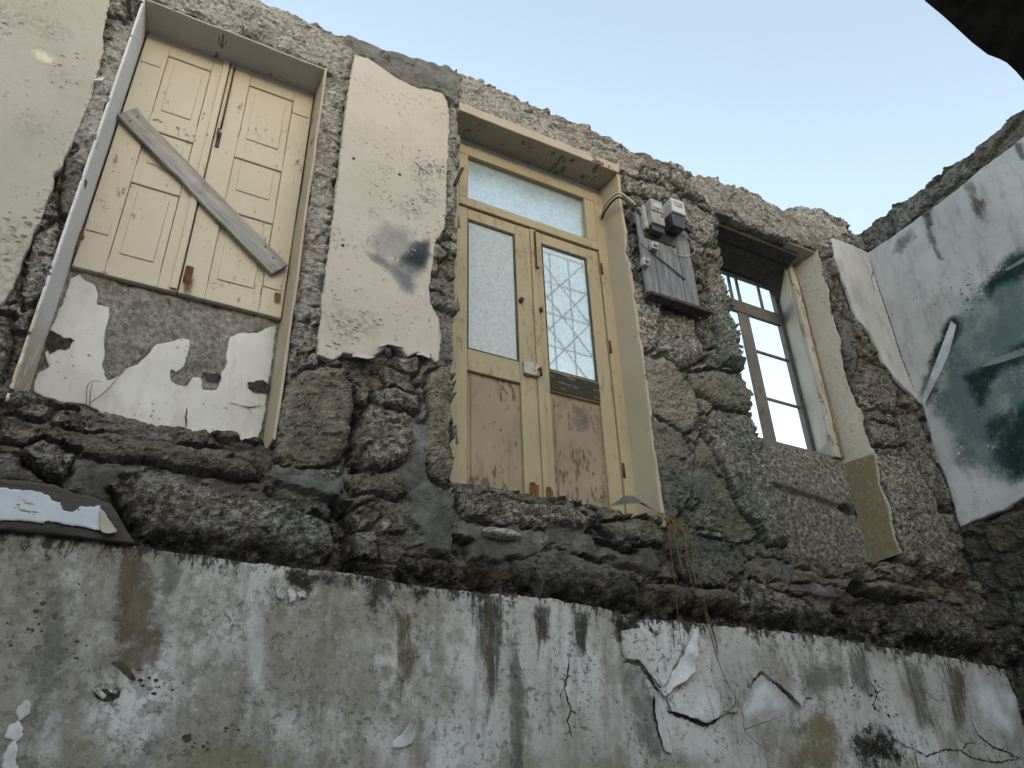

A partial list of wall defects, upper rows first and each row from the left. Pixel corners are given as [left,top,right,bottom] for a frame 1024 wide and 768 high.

spalling [46,331,74,354]
spalling [202,372,222,381]
spalling [247,380,271,392]
damp [286,568,392,613]
damp [471,595,527,715]
damp [534,606,550,643]
damp [574,611,590,666]
crack [560,661,576,738]
peeling [620,627,806,756]
peeling [2,700,31,768]
damp [792,711,904,768]
crack [896,740,1023,768]